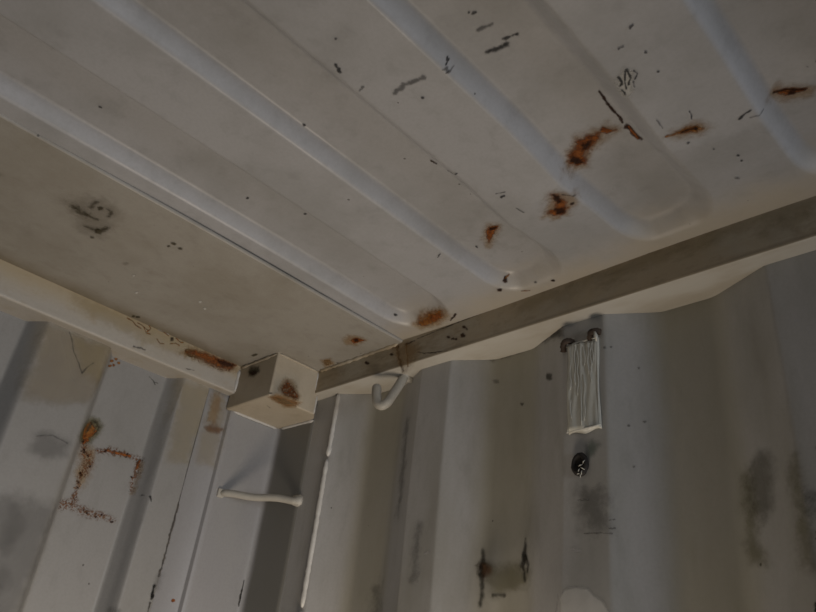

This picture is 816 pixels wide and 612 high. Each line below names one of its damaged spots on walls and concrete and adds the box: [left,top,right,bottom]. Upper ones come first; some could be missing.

rust [773,87,807,95]
rust [567,91,643,166]
rust [665,126,703,138]
rust [549,194,575,216]
rust [390,310,482,372]
rust [186,350,236,371]
rust [271,381,298,407]
rust [59,437,140,523]